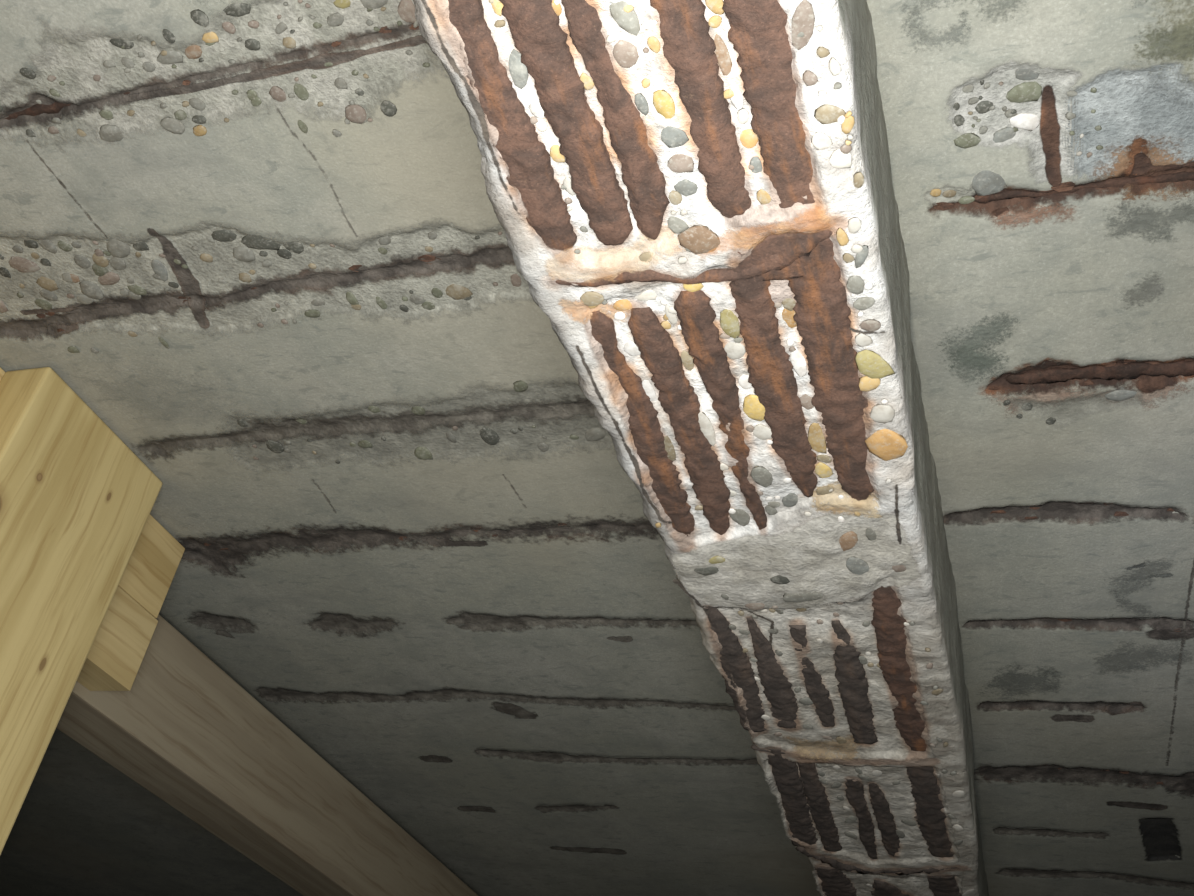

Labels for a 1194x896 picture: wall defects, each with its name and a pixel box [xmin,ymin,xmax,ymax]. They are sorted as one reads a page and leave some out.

spalling [0,0,444,145]
spalling [436,0,522,200]
corrosion [932,202,954,211]
corrosion [991,181,1075,229]
spalling [925,62,1194,205]
corrosion [1093,137,1193,201]
spalling [0,222,533,349]
corrosion [559,300,630,323]
spalling [1006,359,1194,401]
spalling [482,0,975,896]
corrosion [812,483,881,518]
crack [1166,562,1194,766]